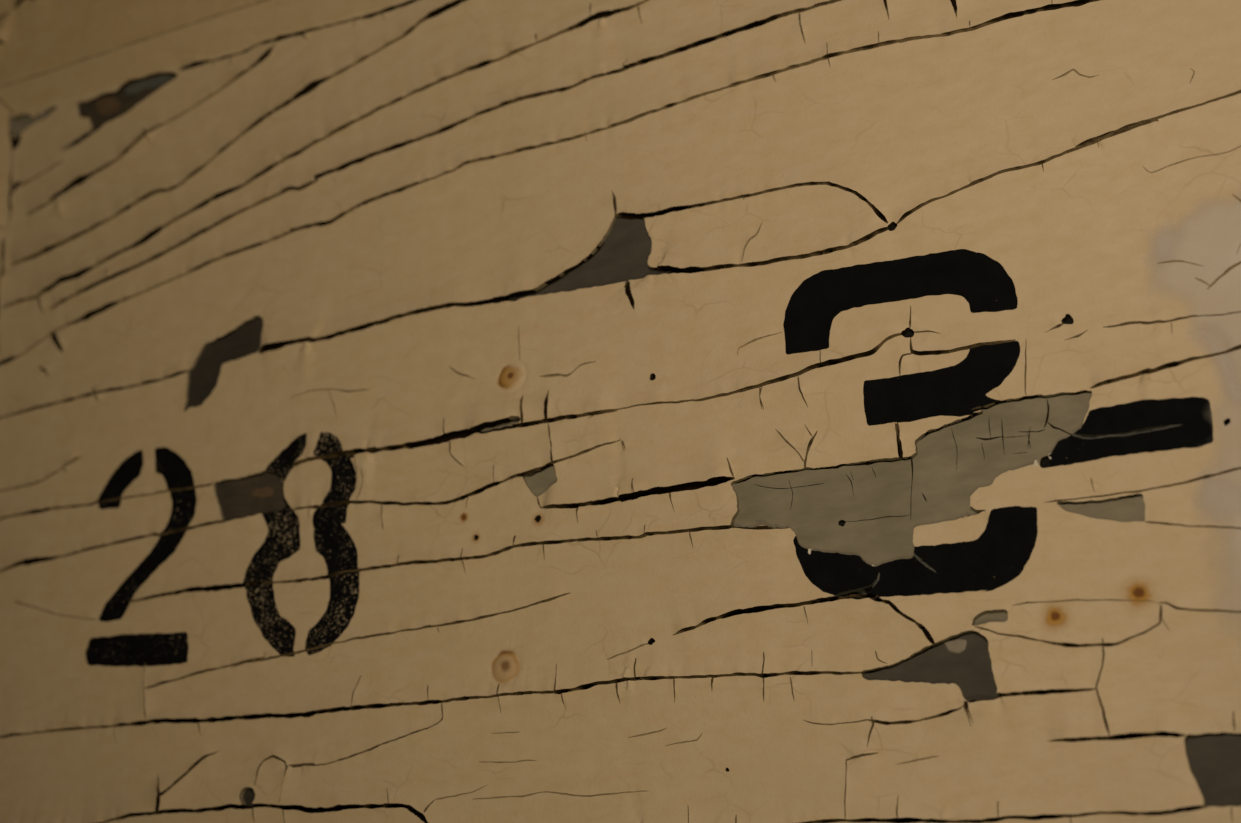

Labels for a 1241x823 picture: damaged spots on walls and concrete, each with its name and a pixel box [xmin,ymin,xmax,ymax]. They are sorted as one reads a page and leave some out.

crack [0,0,1100,420]
peeling [509,216,671,300]
crack [612,68,1241,309]
peeling [183,315,263,413]
crack [129,243,1241,602]
peeling [730,390,1092,566]
crack [0,520,227,572]
crack [0,572,1241,823]
peeling [862,609,1008,701]
rust [1046,608,1065,625]
rust [1129,584,1149,604]
peeling [1184,732,1241,807]